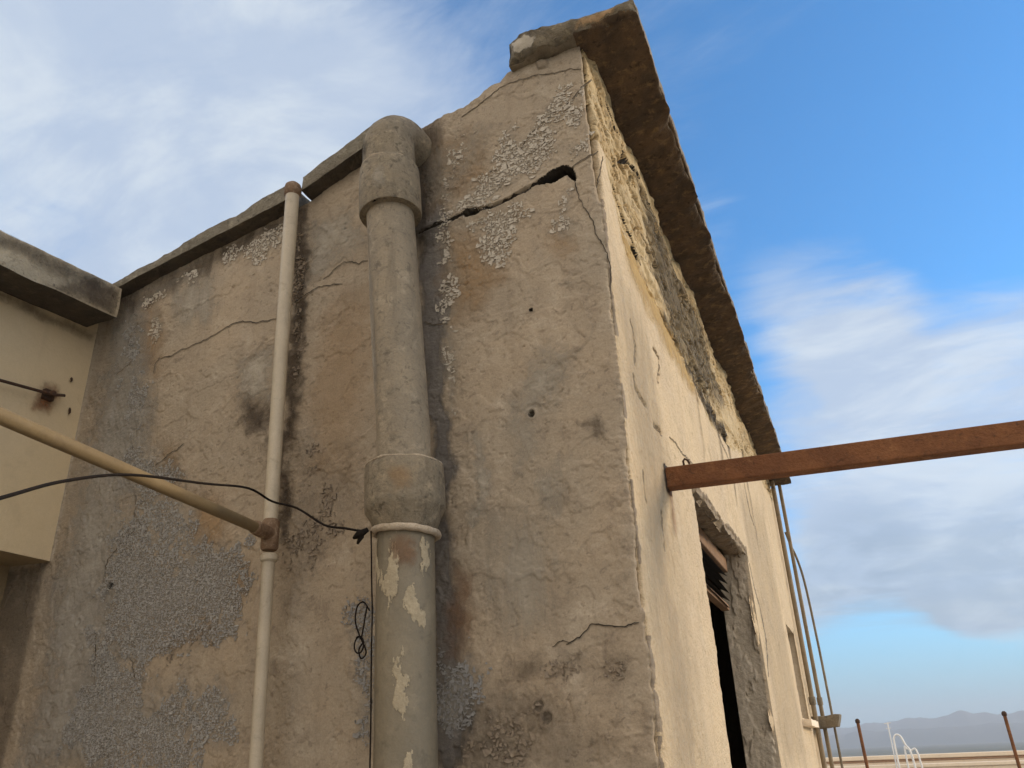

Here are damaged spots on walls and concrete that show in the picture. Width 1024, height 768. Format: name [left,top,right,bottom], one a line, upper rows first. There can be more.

crack [462,68,592,150]
crack [419,104,650,297]
peeling [112,289,185,483]
crack [116,260,368,375]
water stain [415,152,458,501]
peeling [57,483,258,768]
peeling [340,531,431,746]
peeling [403,750,413,768]
water stain [435,518,473,768]
peeling [436,647,492,739]
crack [552,622,639,647]